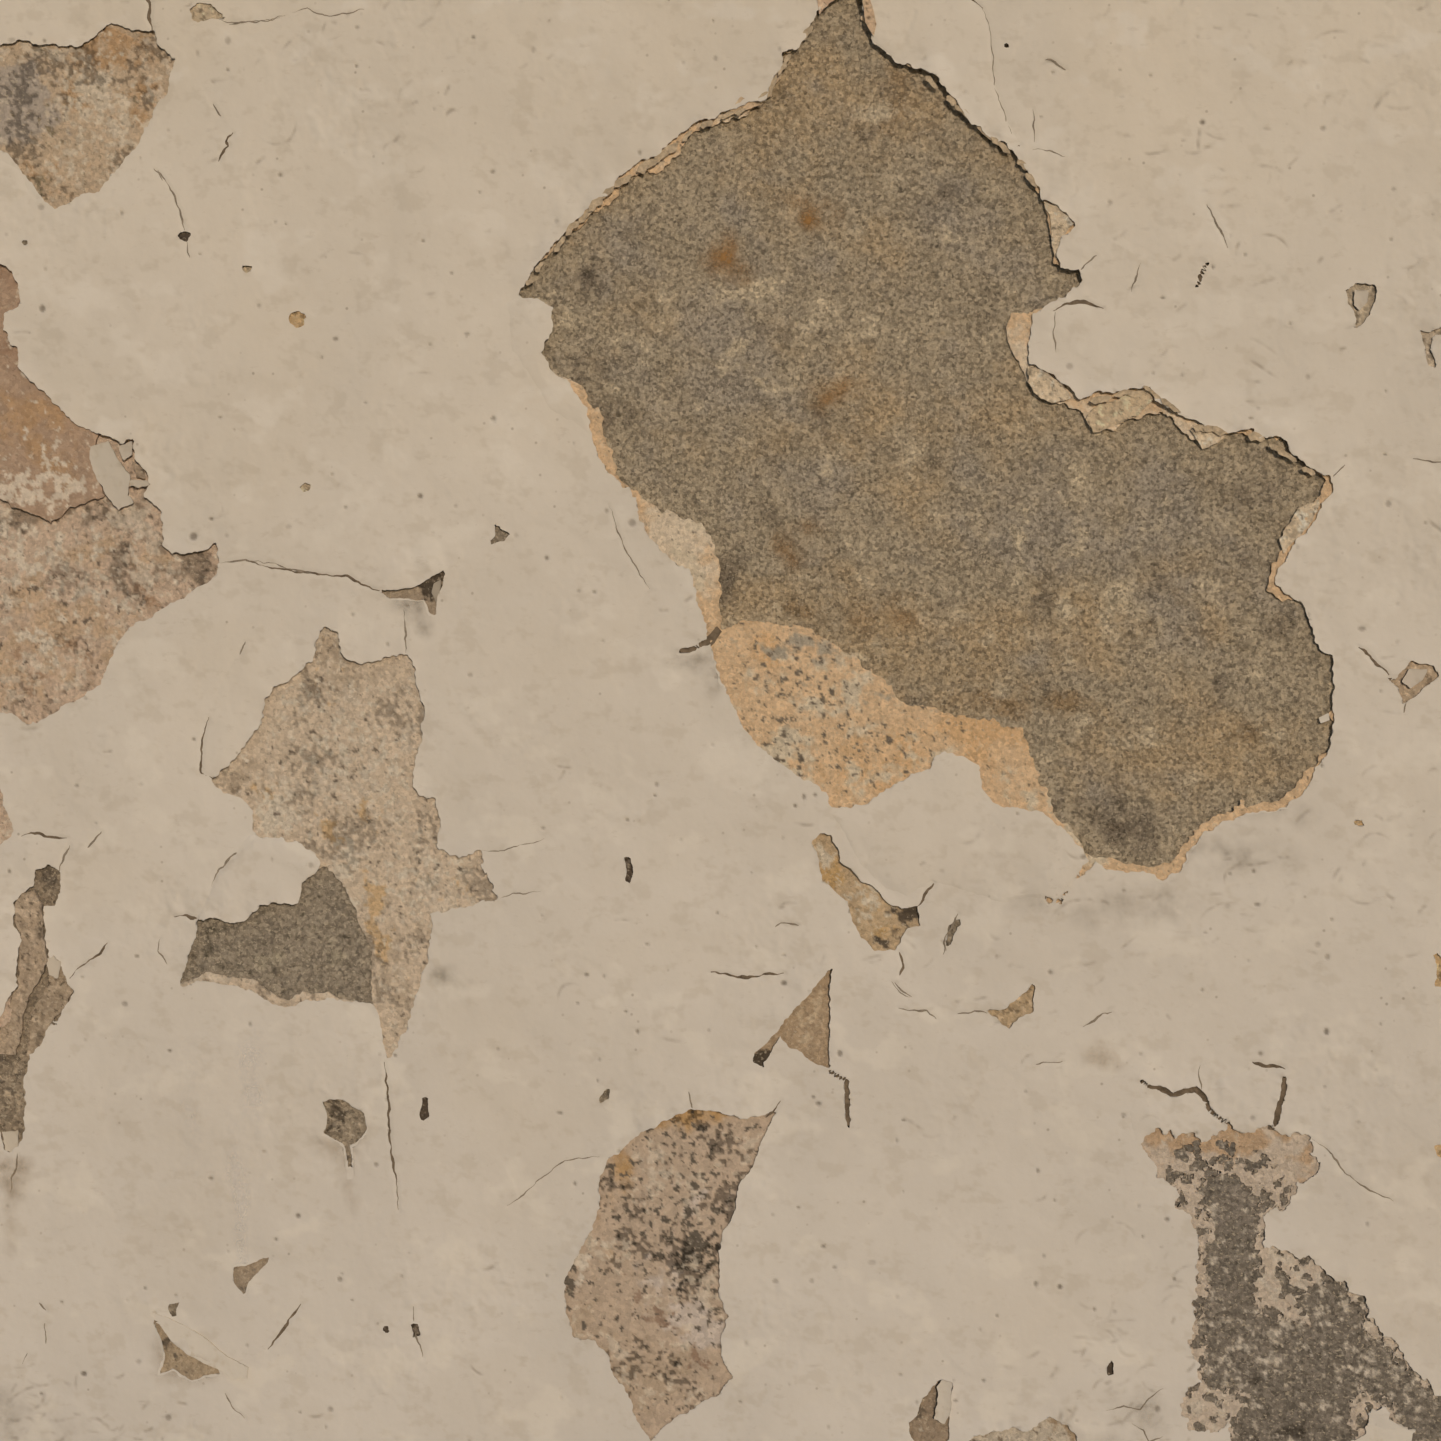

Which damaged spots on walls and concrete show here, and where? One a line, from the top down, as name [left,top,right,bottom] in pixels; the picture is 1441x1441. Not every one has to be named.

peeling [0,23,175,209]
peeling [0,264,219,724]
crack [199,717,214,779]
crack [228,559,407,653]
peeling [180,627,497,1058]
peeling [519,0,1335,904]
peeling [0,864,74,1152]
peeling [564,1109,776,1440]
crack [1141,1067,1228,1124]
crack [1252,1062,1287,1131]
peeling [1141,1121,1441,1441]
crack [1314,1140,1393,1201]